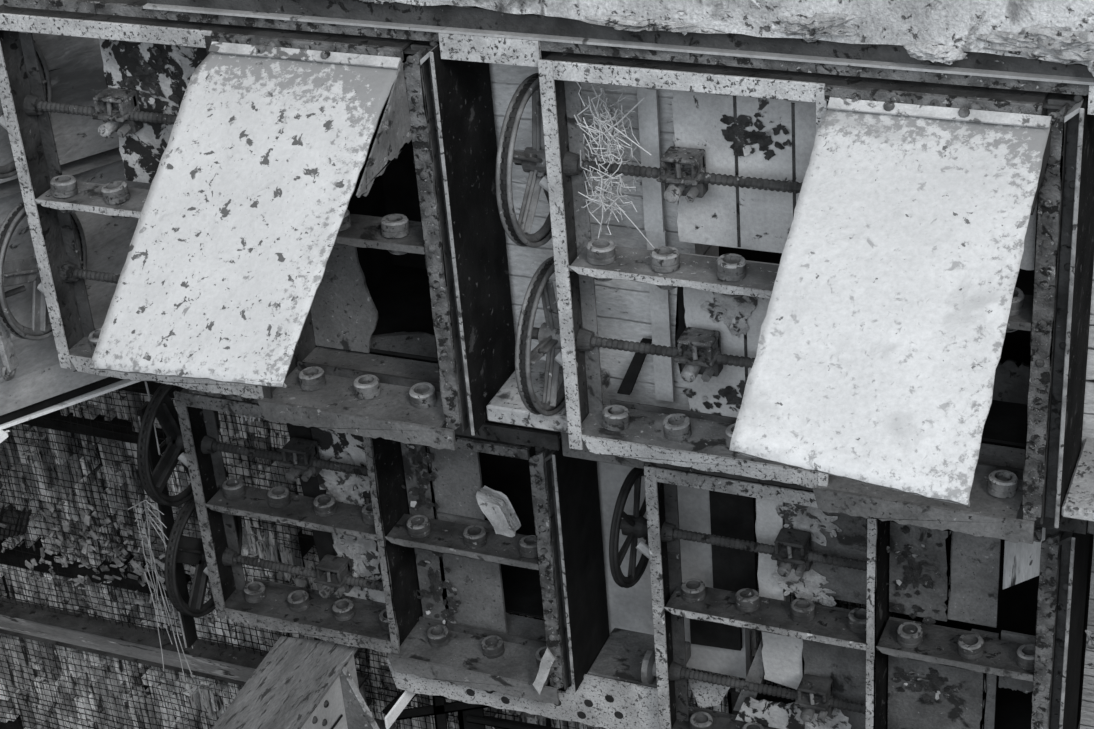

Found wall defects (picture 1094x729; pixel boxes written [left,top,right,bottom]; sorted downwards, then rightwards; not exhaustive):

spalling [772,13,856,42]
spalling [974,24,1094,65]
peeling [117,45,180,111]
peeling [720,113,792,161]